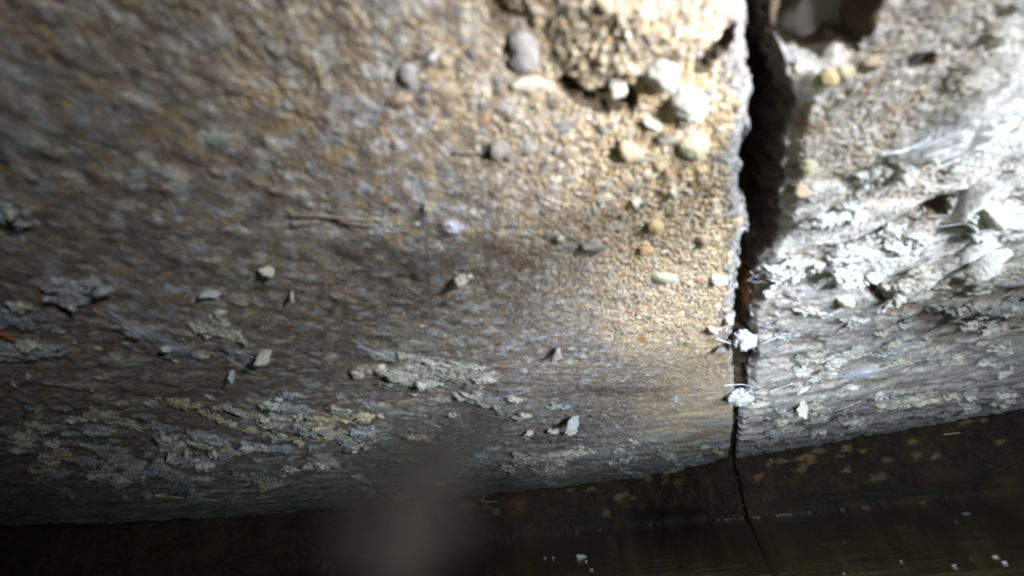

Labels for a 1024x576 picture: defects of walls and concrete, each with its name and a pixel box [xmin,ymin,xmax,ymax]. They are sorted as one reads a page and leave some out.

crack [743,35,759,72]
crack [737,98,753,194]
peeling [159,344,180,364]
peeling [4,370,391,502]
peeling [253,349,272,366]
peeling [351,342,597,486]
crack [728,243,752,518]